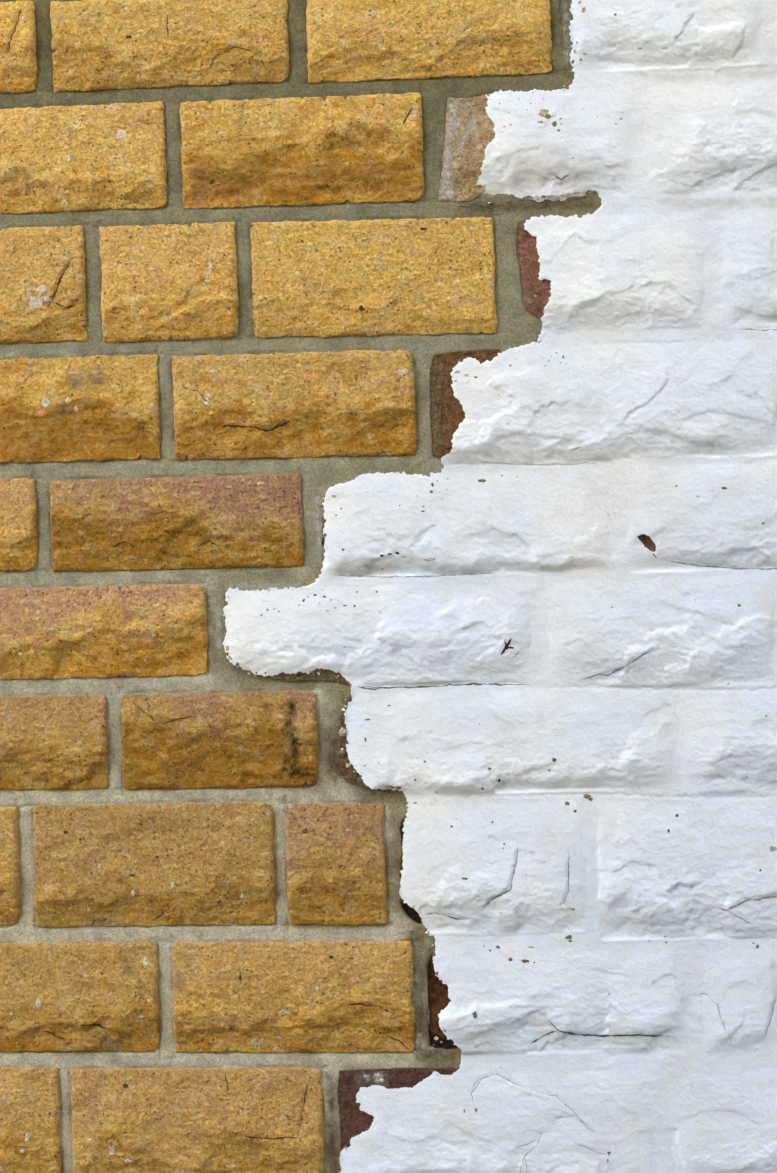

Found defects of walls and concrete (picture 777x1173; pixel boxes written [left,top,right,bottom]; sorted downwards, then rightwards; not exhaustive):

spalling [563,0,587,91]
peeling [438,93,512,202]
peeling [519,92,562,132]
peeling [505,191,595,203]
peeling [517,221,551,319]
peeling [430,349,501,458]
spalling [321,493,342,568]
spalling [222,588,403,794]
peeling [423,926,458,1049]
peeling [338,1068,459,1172]